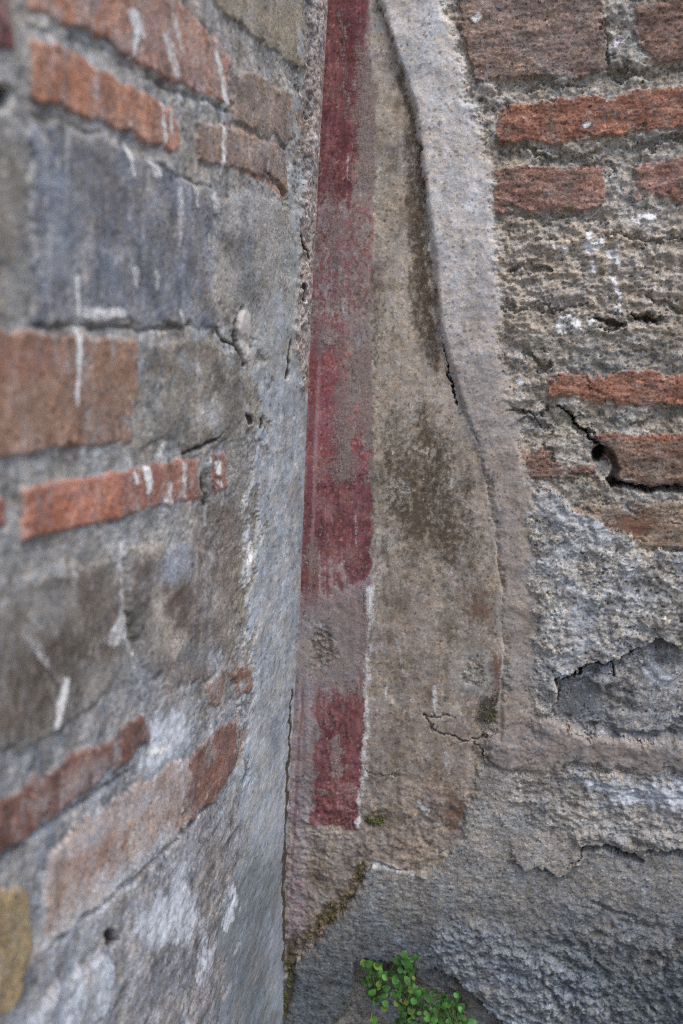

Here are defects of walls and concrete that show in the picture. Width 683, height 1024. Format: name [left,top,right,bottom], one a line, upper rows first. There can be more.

water stain [397,76,440,371]
crack [444,349,458,404]
crack [507,405,602,446]
crack [608,478,682,492]
spalling [550,638,683,743]
crack [423,713,498,760]